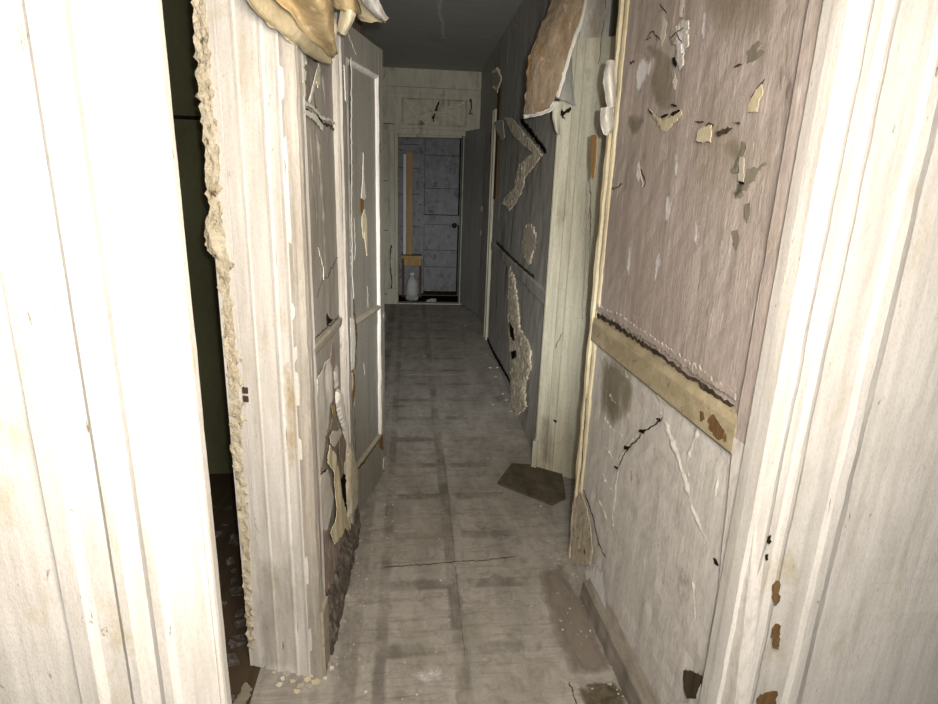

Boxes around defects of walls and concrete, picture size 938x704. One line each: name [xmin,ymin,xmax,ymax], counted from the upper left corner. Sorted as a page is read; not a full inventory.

peeling [524,0,584,115]
peeling [600,60,616,136]
peeling [660,0,689,89]
crack [305,57,368,371]
flaking render [191,0,255,650]
flaking render [325,340,347,512]
crack [580,394,606,557]
crack [614,413,663,469]
peeling [771,580,781,606]
peeling [771,624,781,650]
leakage [581,683,623,704]
peeling [757,691,778,704]